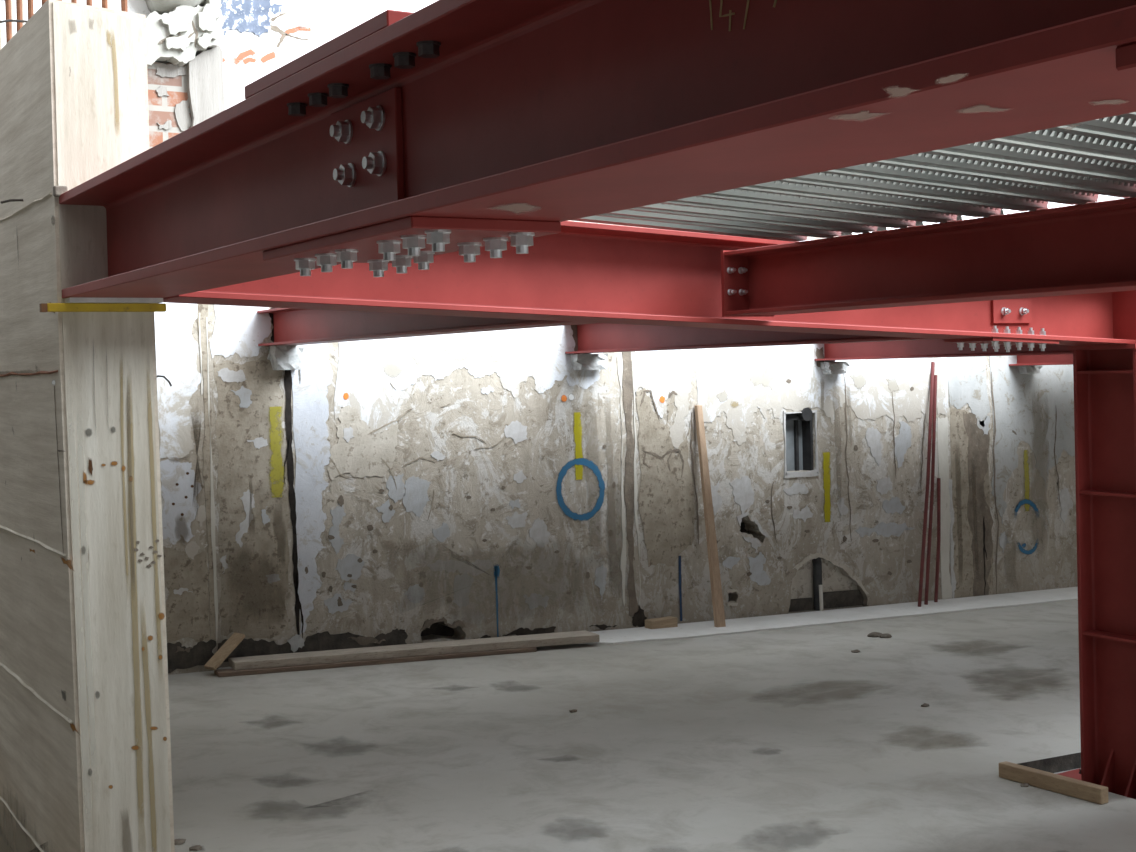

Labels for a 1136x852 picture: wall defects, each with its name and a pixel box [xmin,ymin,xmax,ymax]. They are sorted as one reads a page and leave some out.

spalling [146,0,282,148]
crack [284,370,304,638]
spalling [136,302,603,673]
peeling [586,344,1075,627]